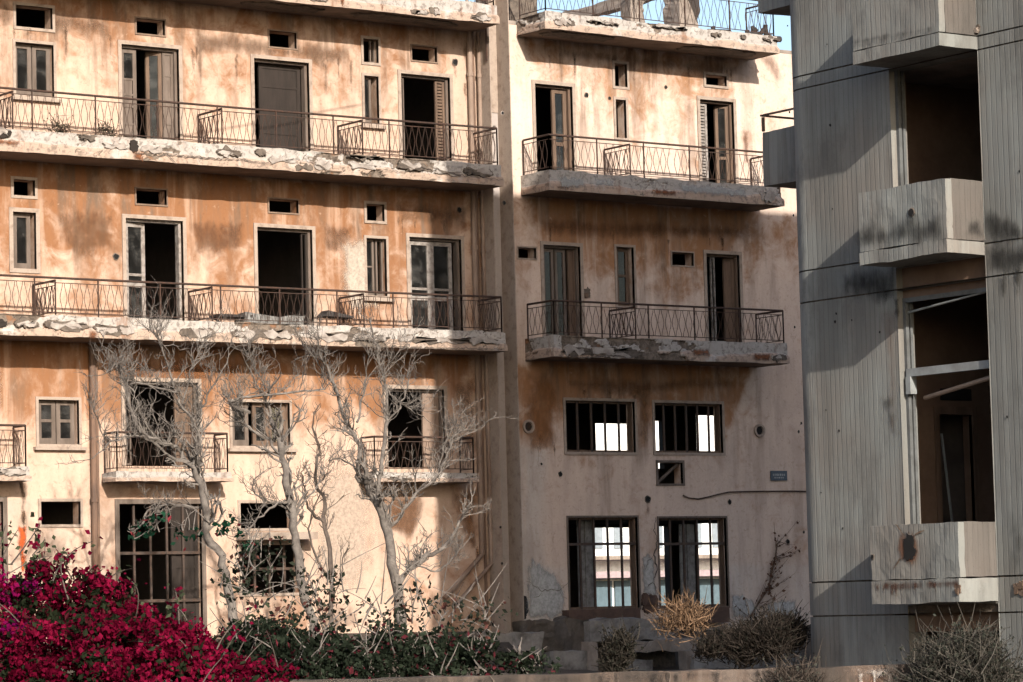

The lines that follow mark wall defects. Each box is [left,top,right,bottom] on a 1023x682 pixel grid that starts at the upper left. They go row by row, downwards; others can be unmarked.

spalling [240,0,328,14]
spalling [350,7,458,27]
spalling [471,12,491,23]
spalling [0,127,12,138]
spalling [79,134,162,154]
spalling [216,145,242,158]
spalling [254,149,332,171]
water stain [972,216,1020,237]
water stain [993,249,1023,286]
spalling [0,316,135,337]
spalling [561,344,642,359]